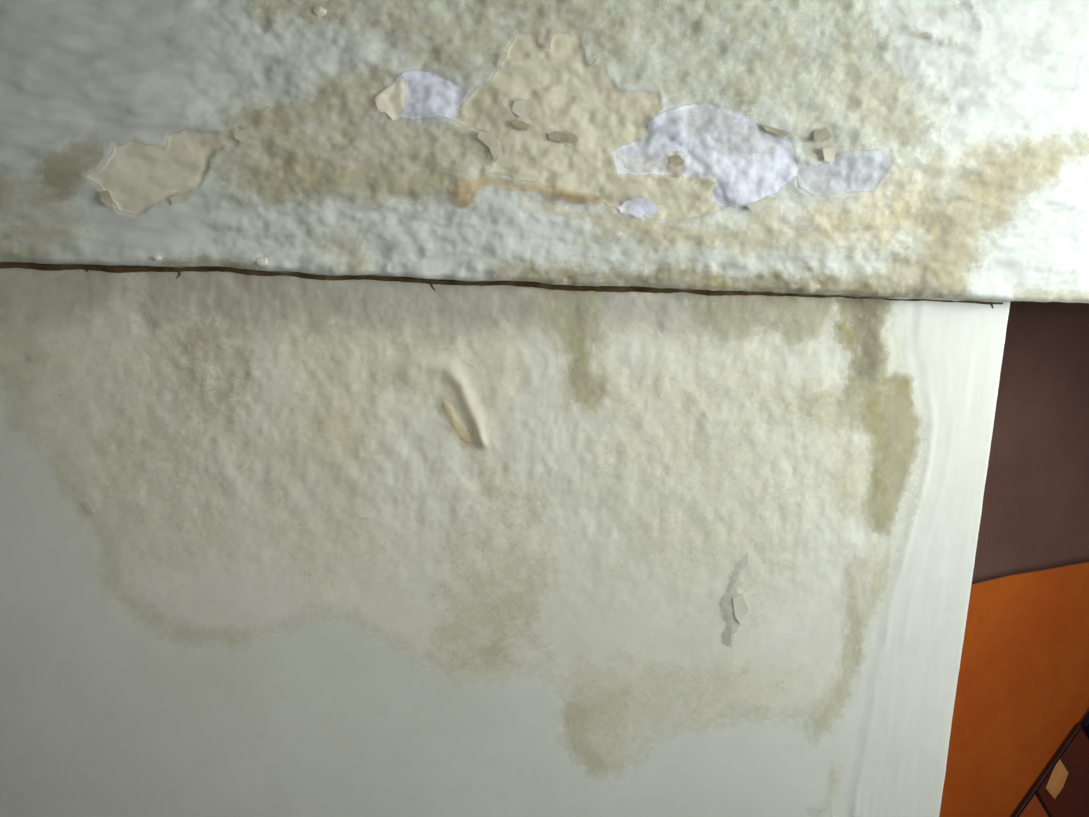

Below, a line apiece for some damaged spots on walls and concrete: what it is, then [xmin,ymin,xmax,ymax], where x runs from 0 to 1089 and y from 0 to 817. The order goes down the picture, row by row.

peeling [85,128,251,214]
damp [210,69,490,208]
peeling [375,32,891,220]
crack [0,262,1003,308]
damp [0,138,1089,773]